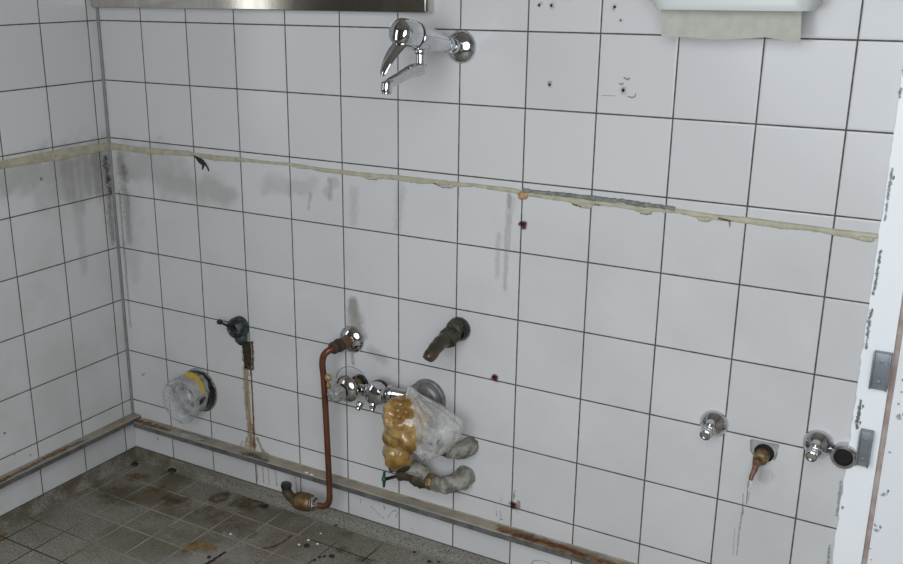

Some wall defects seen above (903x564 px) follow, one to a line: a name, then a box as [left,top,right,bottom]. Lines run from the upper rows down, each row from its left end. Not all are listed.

rust [242,341,268,462]
rust [497,527,614,564]